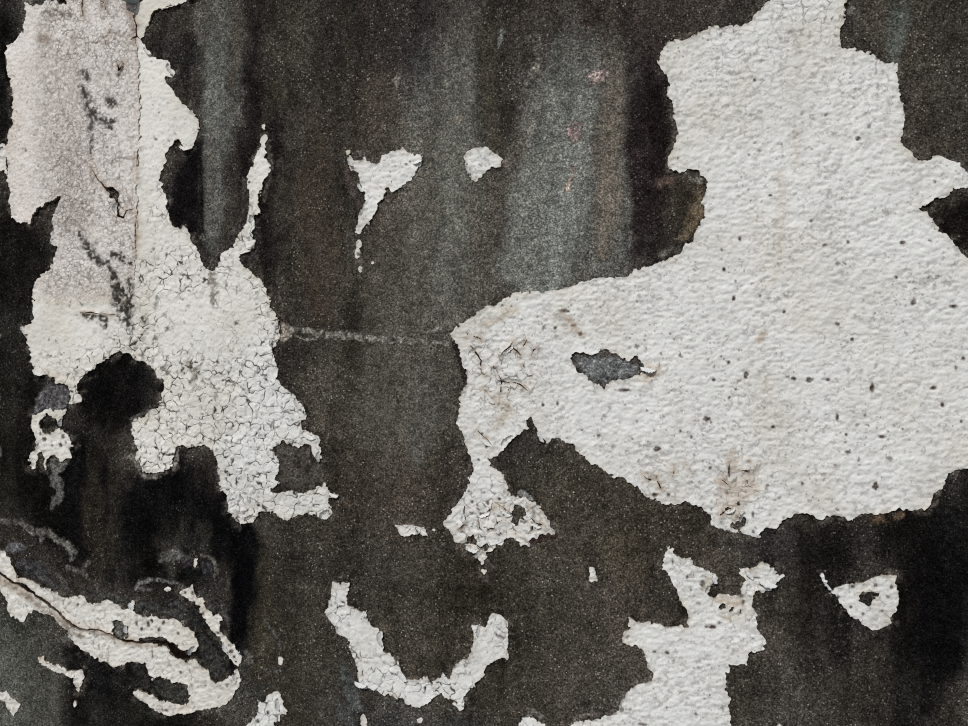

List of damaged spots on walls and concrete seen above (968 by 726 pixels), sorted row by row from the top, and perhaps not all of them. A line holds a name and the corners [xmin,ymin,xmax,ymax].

peeling [20,0,338,524]
peeling [345,147,423,283]
crack [284,321,536,399]
water stain [495,50,669,294]
peeling [395,0,968,583]
water stain [82,439,119,583]
crack [0,571,190,659]
peeling [0,518,254,716]
peeling [246,691,288,726]
peeling [325,581,509,723]